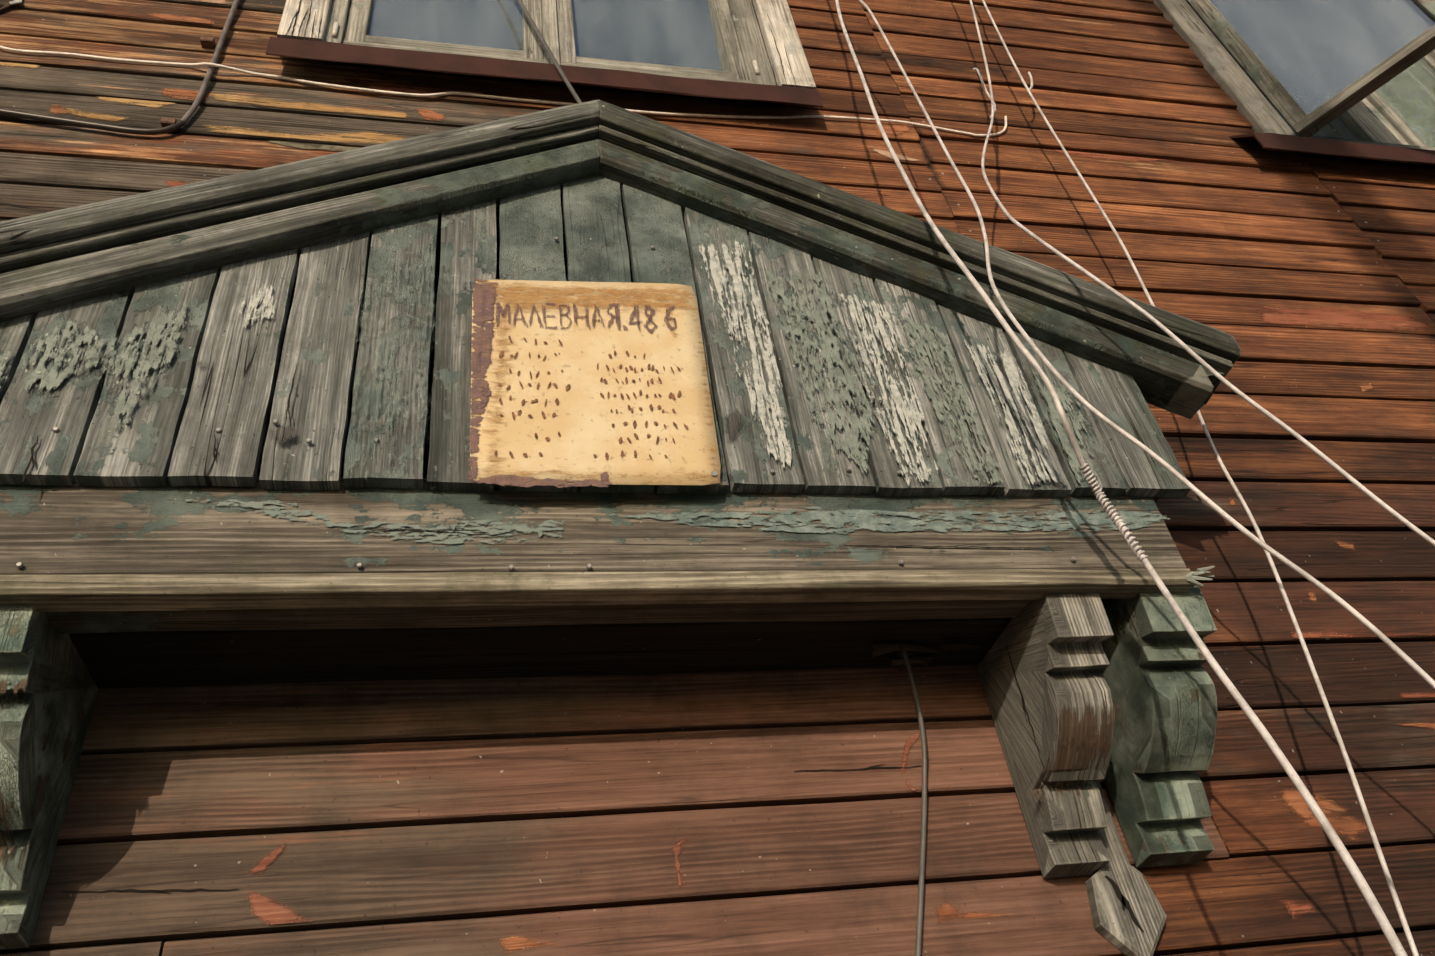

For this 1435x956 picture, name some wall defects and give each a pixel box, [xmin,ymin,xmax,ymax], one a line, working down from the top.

peeling [49,79,487,121]
peeling [209,125,406,143]
peeling [239,285,278,328]
peeling [0,301,188,431]
peeling [699,239,1098,486]
peeling [183,499,565,544]
peeling [609,506,1170,534]
peeling [0,679,28,708]
crack [1006,644,1044,768]